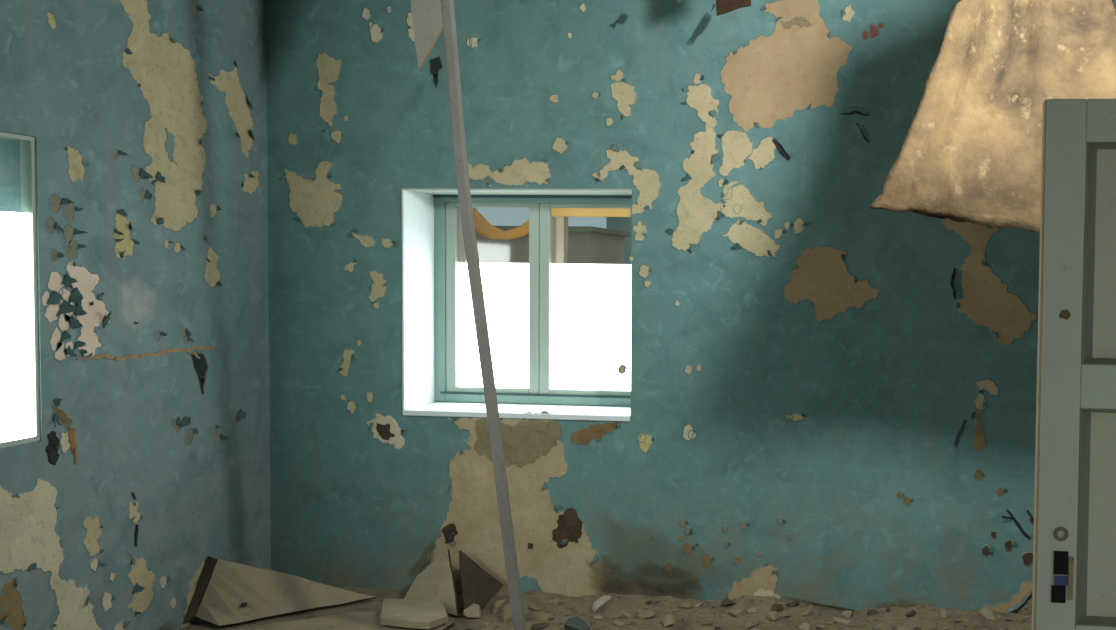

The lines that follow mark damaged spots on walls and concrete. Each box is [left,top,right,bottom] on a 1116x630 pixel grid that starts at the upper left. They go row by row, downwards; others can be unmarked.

peeling [40,192,138,362]
peeling [110,0,259,262]
peeling [315,51,350,145]
peeling [282,160,398,310]
peeling [591,68,638,127]
peeling [590,143,663,242]
peeling [667,0,885,261]
peeling [782,245,884,324]
peeling [940,218,1038,347]
peeling [0,477,218,630]
spalling [369,422,404,440]
flaking render [424,411,622,597]